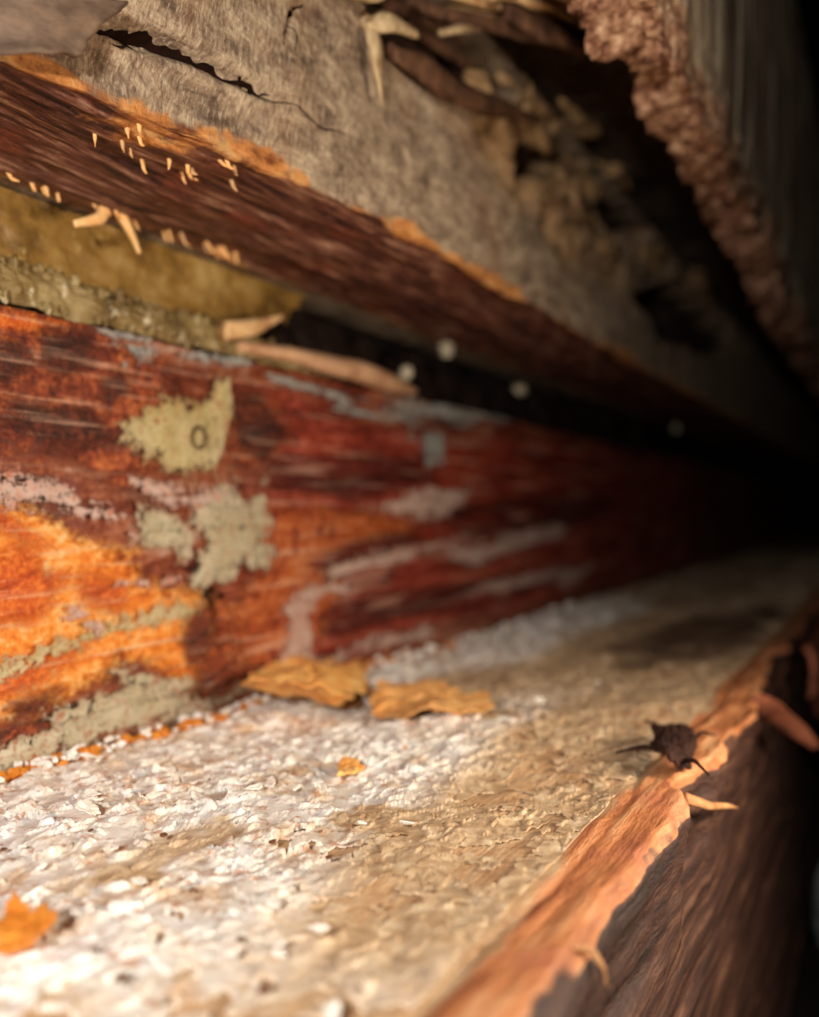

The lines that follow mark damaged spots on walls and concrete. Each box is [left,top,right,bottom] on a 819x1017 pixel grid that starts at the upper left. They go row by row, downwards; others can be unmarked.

crack [96,29,364,144]
crack [284,5,303,51]
spalling [0,254,514,684]
corrosion [0,305,694,750]